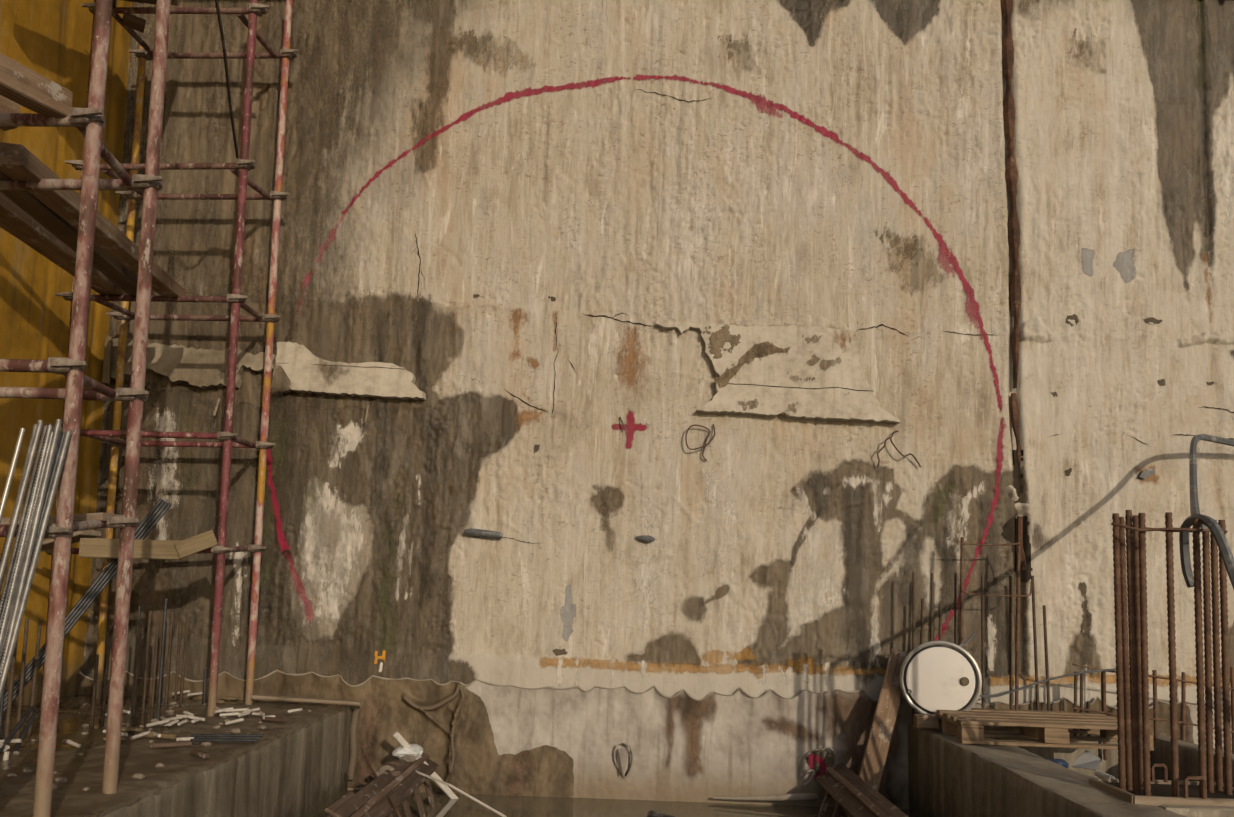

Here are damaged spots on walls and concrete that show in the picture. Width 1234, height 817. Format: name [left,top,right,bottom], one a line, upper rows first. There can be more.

leakage [779,0,850,46]
leakage [872,0,940,44]
leakage [1131,0,1234,290]
flaking render [110,338,426,400]
leakage [78,0,574,798]
crack [504,317,576,417]
crack [587,313,655,329]
corrosion [618,328,643,387]
flaking render [655,319,900,424]
leakage [611,459,1049,776]
leakage [986,582,1131,719]
leakage [878,715,901,806]